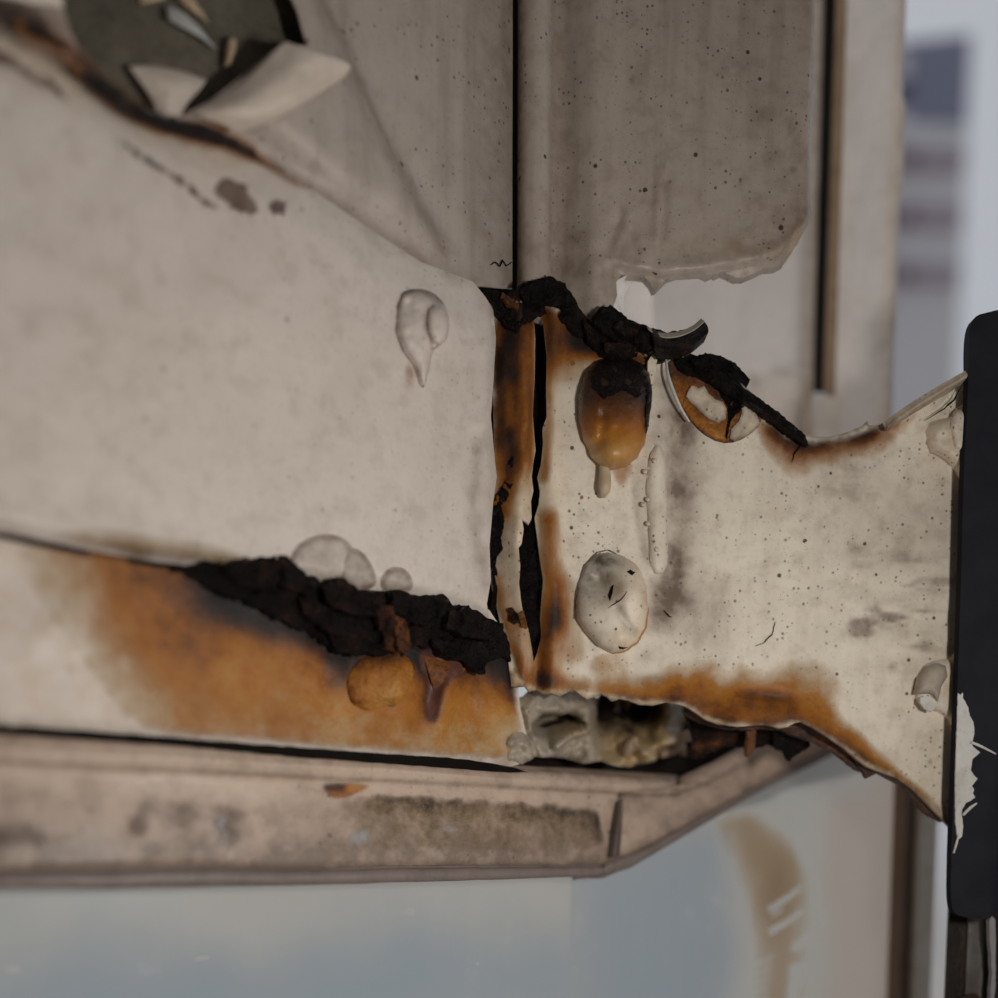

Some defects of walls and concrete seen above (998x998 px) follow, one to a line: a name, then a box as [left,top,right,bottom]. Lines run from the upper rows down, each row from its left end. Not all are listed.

peeling [0,52,63,97]
peeling [16,0,351,134]
peeling [125,142,258,214]
peeling [270,201,286,216]
corrosion [481,276,900,520]
peeling [647,355,761,443]
crack [487,323,547,661]
corrosion [54,511,942,822]